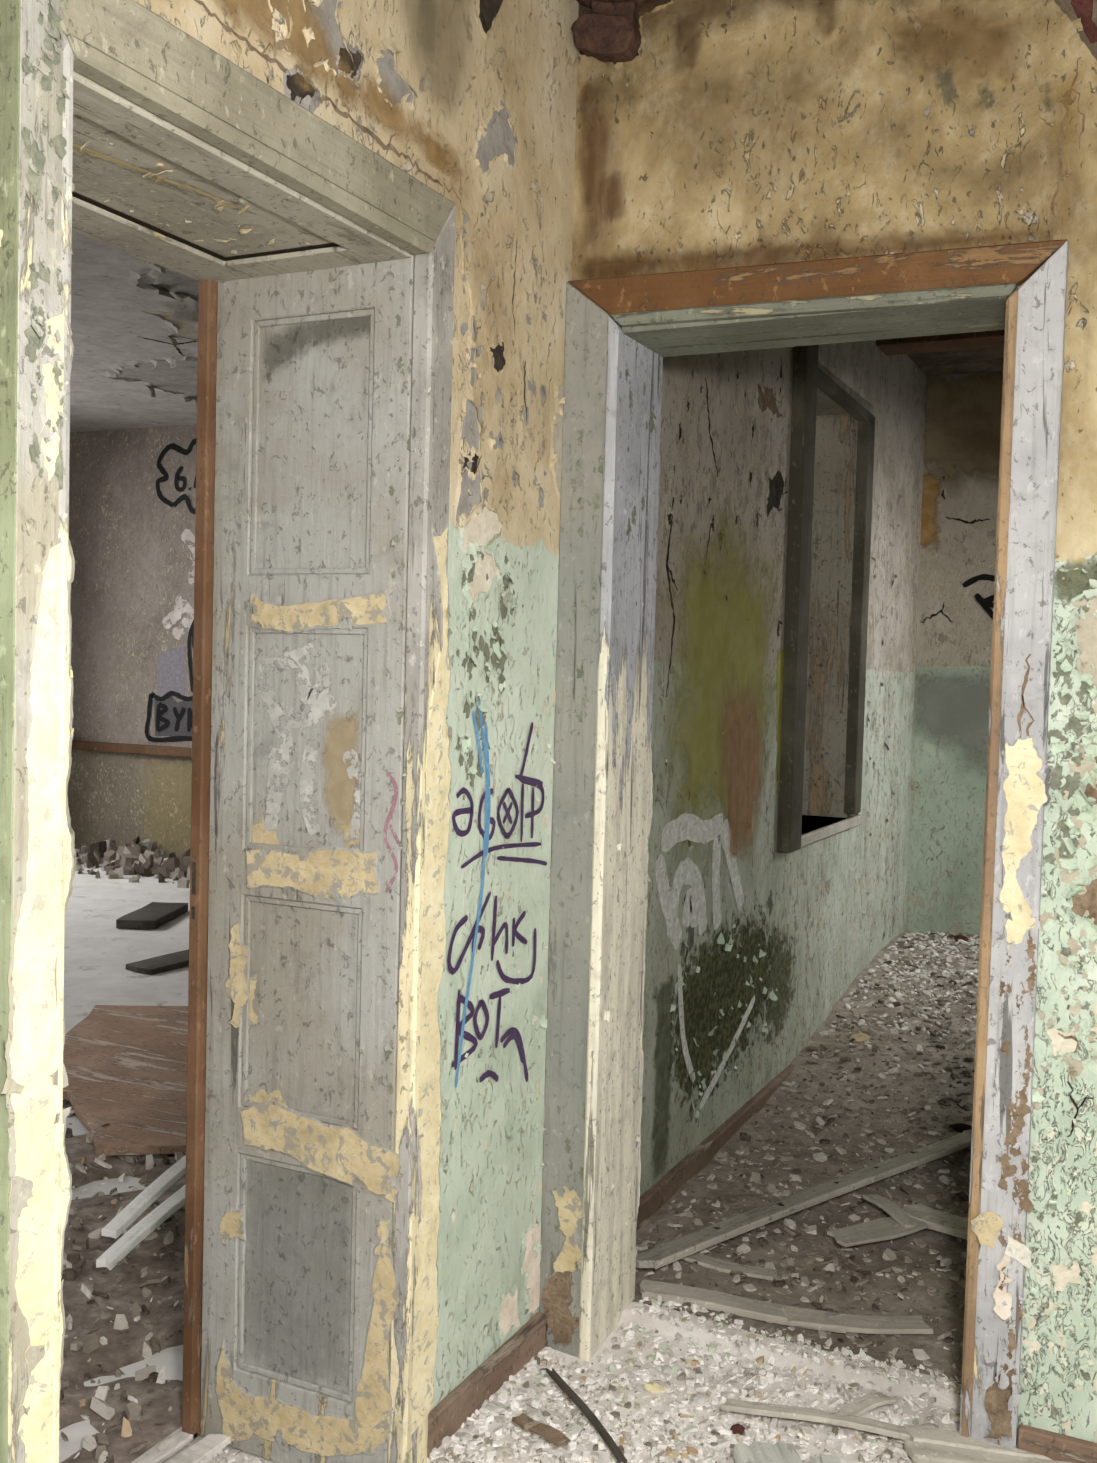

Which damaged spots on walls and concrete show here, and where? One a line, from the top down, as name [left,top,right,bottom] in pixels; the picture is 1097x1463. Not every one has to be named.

crack [194,0,287,73]
peeling [268,0,418,113]
flaking render [475,0,506,41]
flaking render [571,0,675,70]
water stain [902,11,1008,103]
flaking render [1043,0,1097,73]
crack [319,95,459,199]
peeling [468,96,519,178]
water stain [585,245,830,279]
peeling [213,205,516,1458]
peeling [1,537,77,1463]
peeling [496,1137,584,1349]